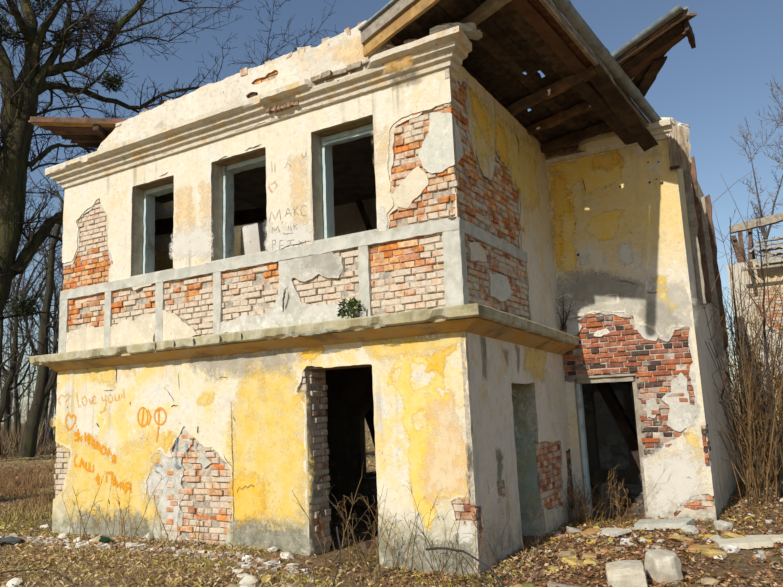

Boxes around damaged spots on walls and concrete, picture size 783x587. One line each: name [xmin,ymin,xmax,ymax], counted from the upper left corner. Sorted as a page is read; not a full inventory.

flaking render [62,198,113,291]
peeling [53,346,324,545]
crack [224,410,235,535]
spalling [285,328,340,337]
peeling [363,332,482,543]
flaking render [374,77,586,249]
flaking render [535,441,573,510]
damp [549,168,695,338]
flaking render [560,311,714,518]